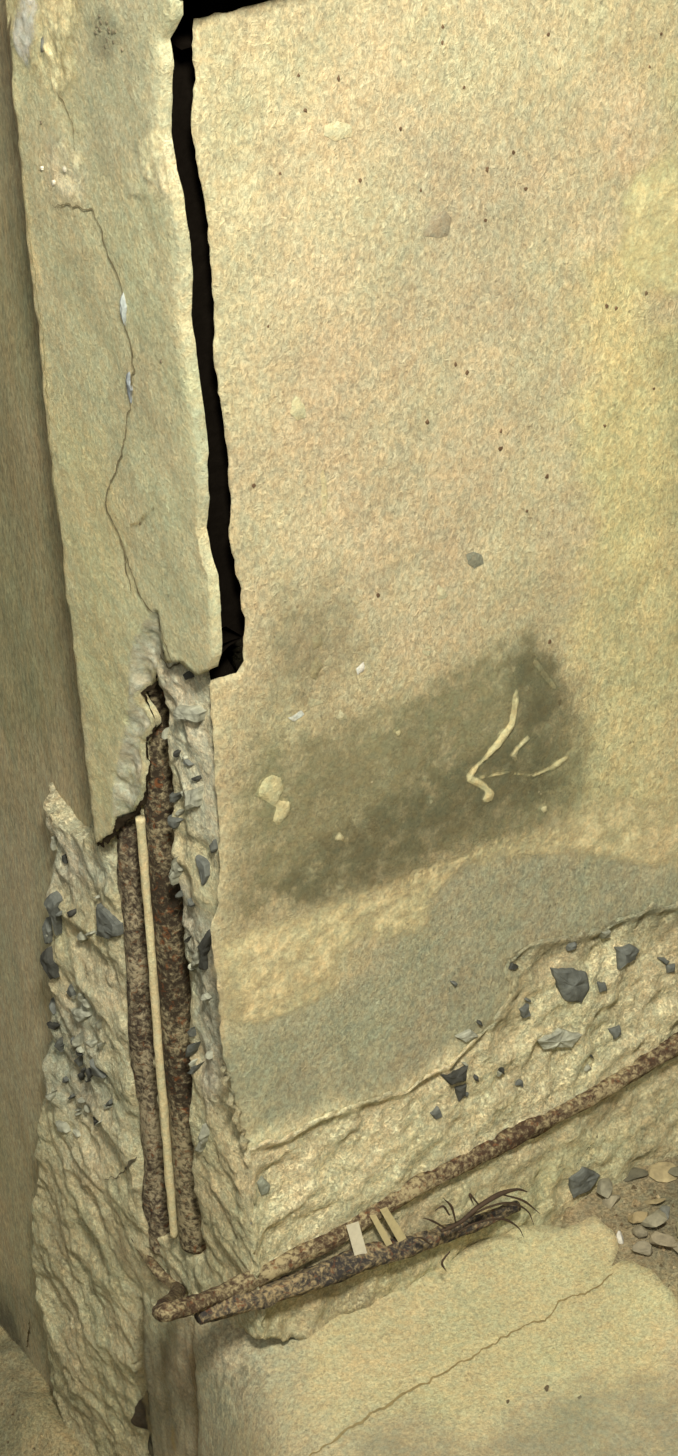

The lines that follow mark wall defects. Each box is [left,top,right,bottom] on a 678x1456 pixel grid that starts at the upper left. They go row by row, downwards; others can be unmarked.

crack [21,0,268,848]
spalling [31,646,678,1456]
leakage [242,646,582,915]
crack [309,1273,613,1456]